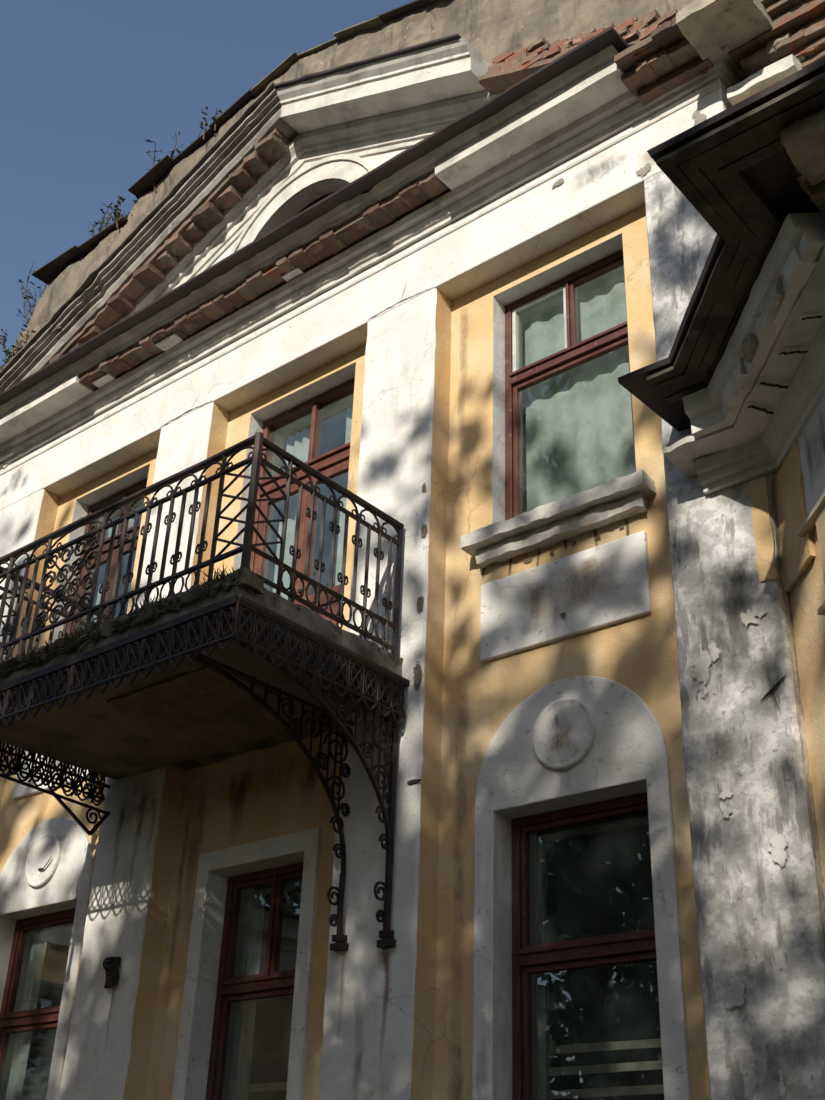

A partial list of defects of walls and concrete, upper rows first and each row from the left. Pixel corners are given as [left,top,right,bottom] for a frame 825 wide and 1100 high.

peeling [692,106,706,126]
peeling [636,163,651,178]
peeling [691,602,768,697]
peeling [719,785,733,818]
peeling [767,827,788,866]